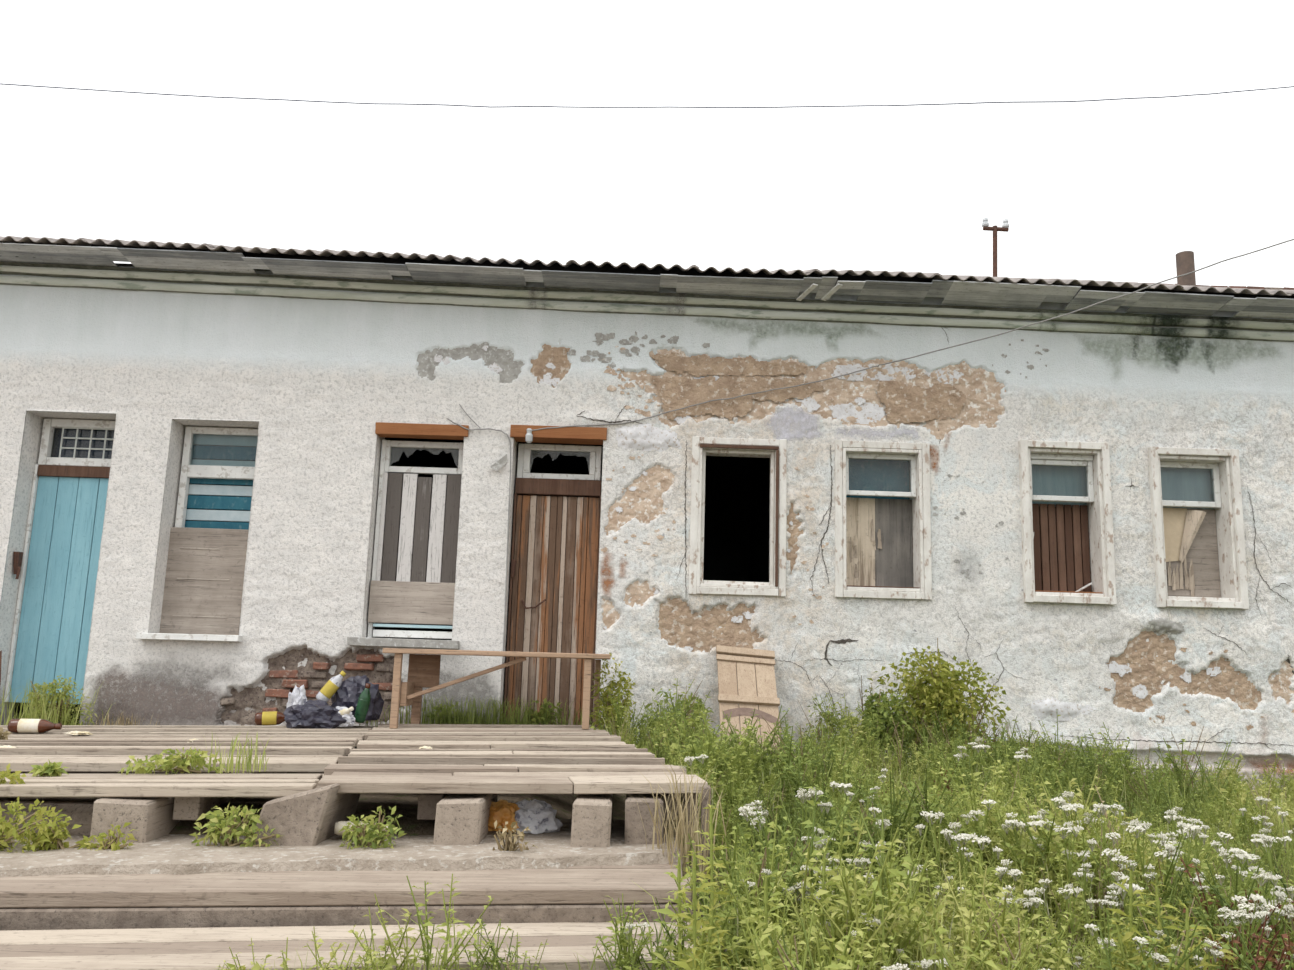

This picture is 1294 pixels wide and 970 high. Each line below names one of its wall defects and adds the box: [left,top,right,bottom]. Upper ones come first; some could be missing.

spalling [416,331,1049,440]
damp [1134,314,1245,365]
flaking render [600,454,676,556]
spalling [601,580,764,653]
spalling [1099,631,1294,730]